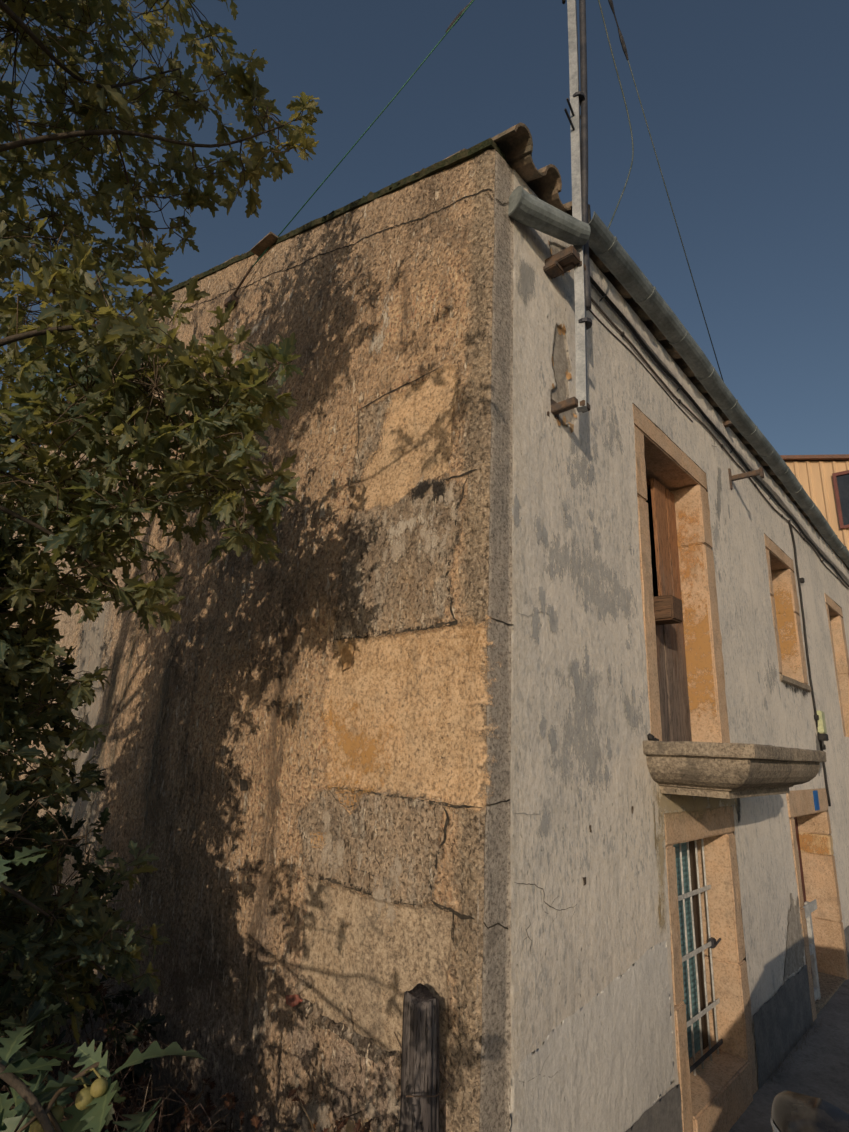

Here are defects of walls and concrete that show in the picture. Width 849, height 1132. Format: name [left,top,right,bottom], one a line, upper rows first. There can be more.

peeling [512,323,637,652]
crack [299,787,577,952]
flaking render [783,893,805,983]